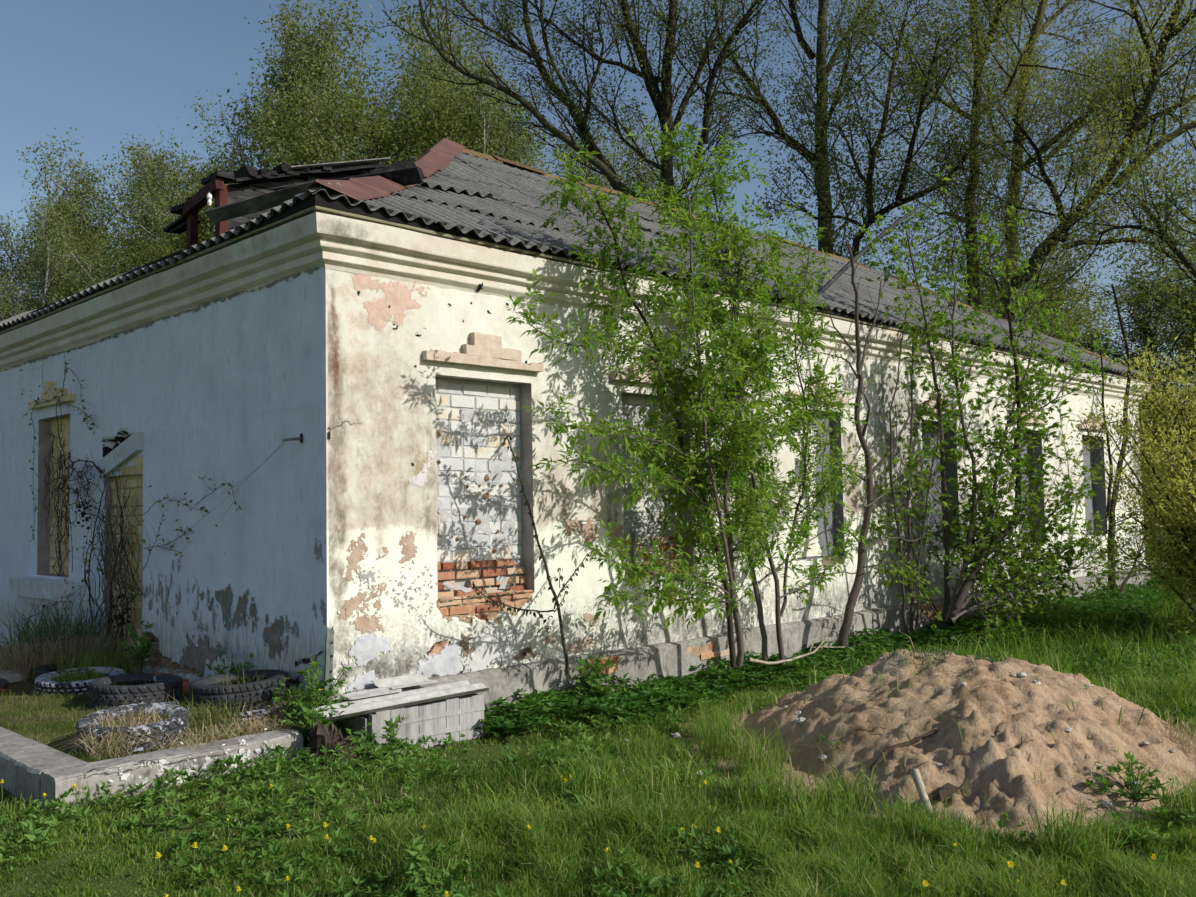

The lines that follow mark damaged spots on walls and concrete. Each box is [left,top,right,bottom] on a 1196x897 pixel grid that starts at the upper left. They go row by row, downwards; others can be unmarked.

peeling [351,274,430,331]
water stain [328,354,345,542]
peeling [141,560,311,687]
flaking render [312,531,538,672]
peeling [565,515,626,562]